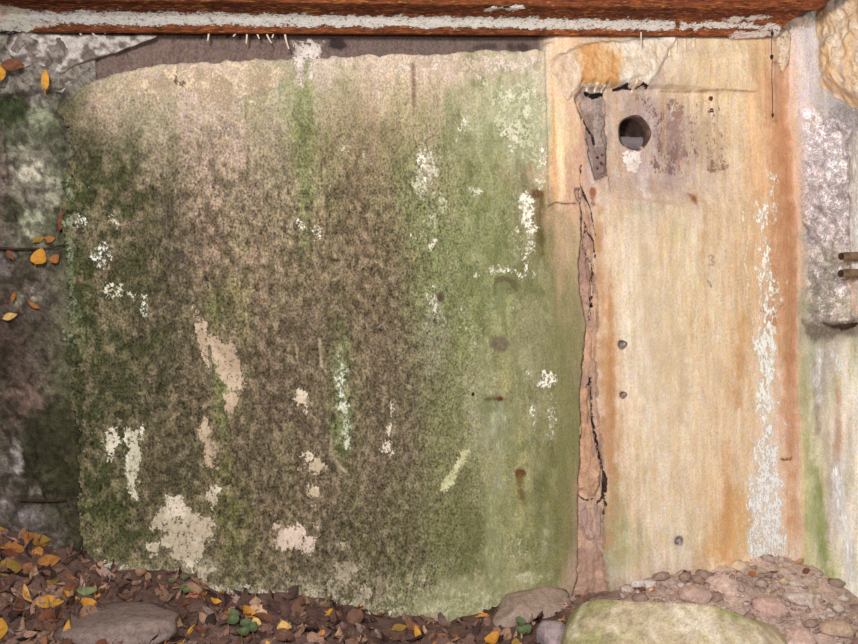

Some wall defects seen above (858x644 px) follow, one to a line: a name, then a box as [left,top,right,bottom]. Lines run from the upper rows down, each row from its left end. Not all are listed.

spalling [574,87,608,181]
peeling [145,412,275,593]
peeling [191,306,247,417]
peeling [272,515,321,557]
efflorescence [318,339,352,473]
damp [416,471,553,619]
damp [479,370,558,459]
corrosion [516,469,526,498]
crack [578,378,607,522]
efflorescence [741,172,791,558]